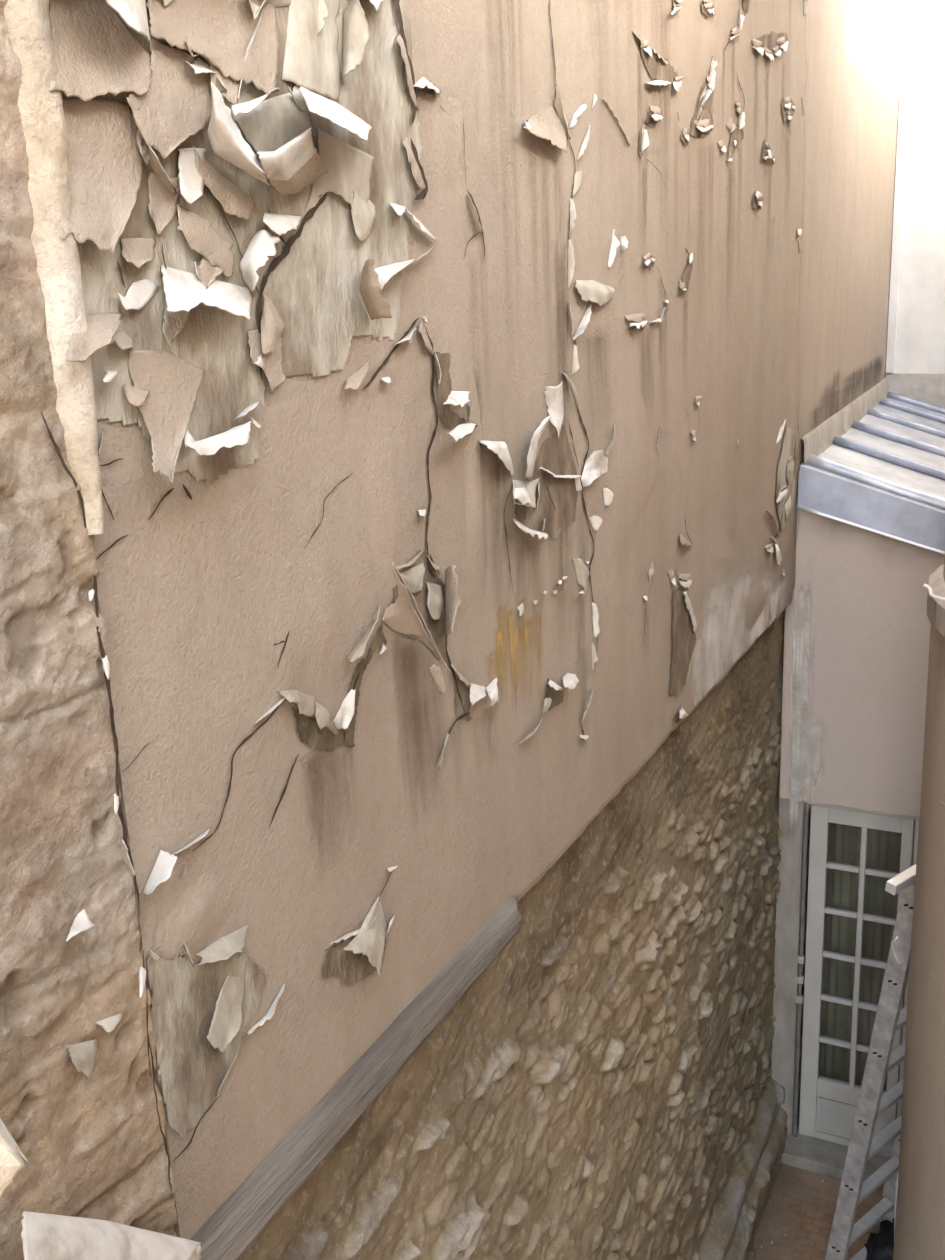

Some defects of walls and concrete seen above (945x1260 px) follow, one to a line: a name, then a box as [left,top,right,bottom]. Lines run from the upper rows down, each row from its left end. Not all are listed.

peeling [632,0,788,192]
peeling [49,0,445,483]
crack [305,474,351,548]
crack [362,318,440,575]
peeling [433,352,578,593]
crack [41,412,286,915]
crack [274,632,289,666]
peeling [253,542,499,828]
peeling [0,1118,29,1202]
peeling [21,1211,202,1260]
crack [142,950,172,1192]
peeling [139,924,286,1162]